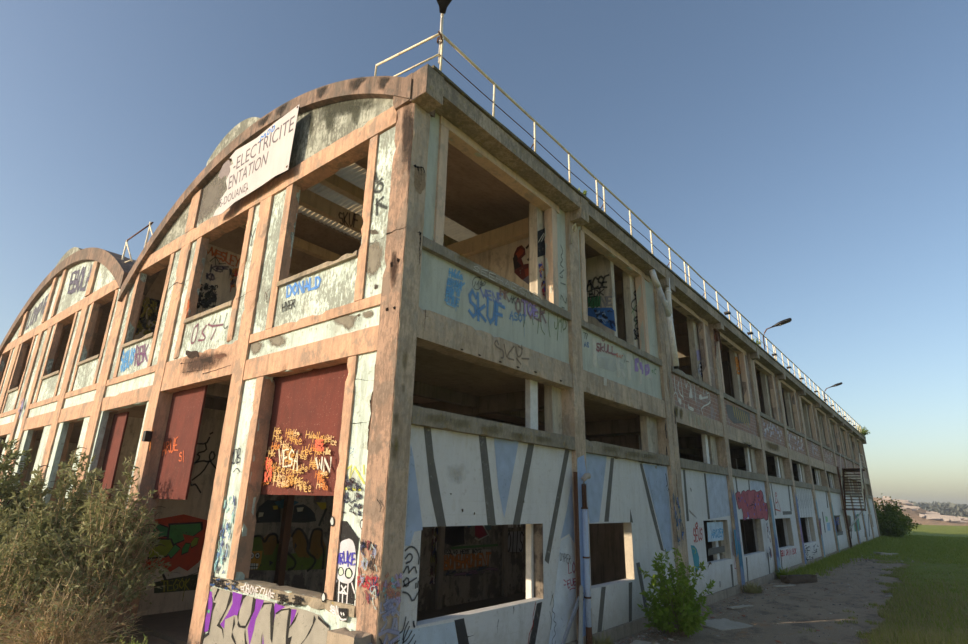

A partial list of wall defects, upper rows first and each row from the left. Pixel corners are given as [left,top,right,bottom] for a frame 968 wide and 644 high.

water stain [309,78,374,136]
peeling [366,229,400,289]